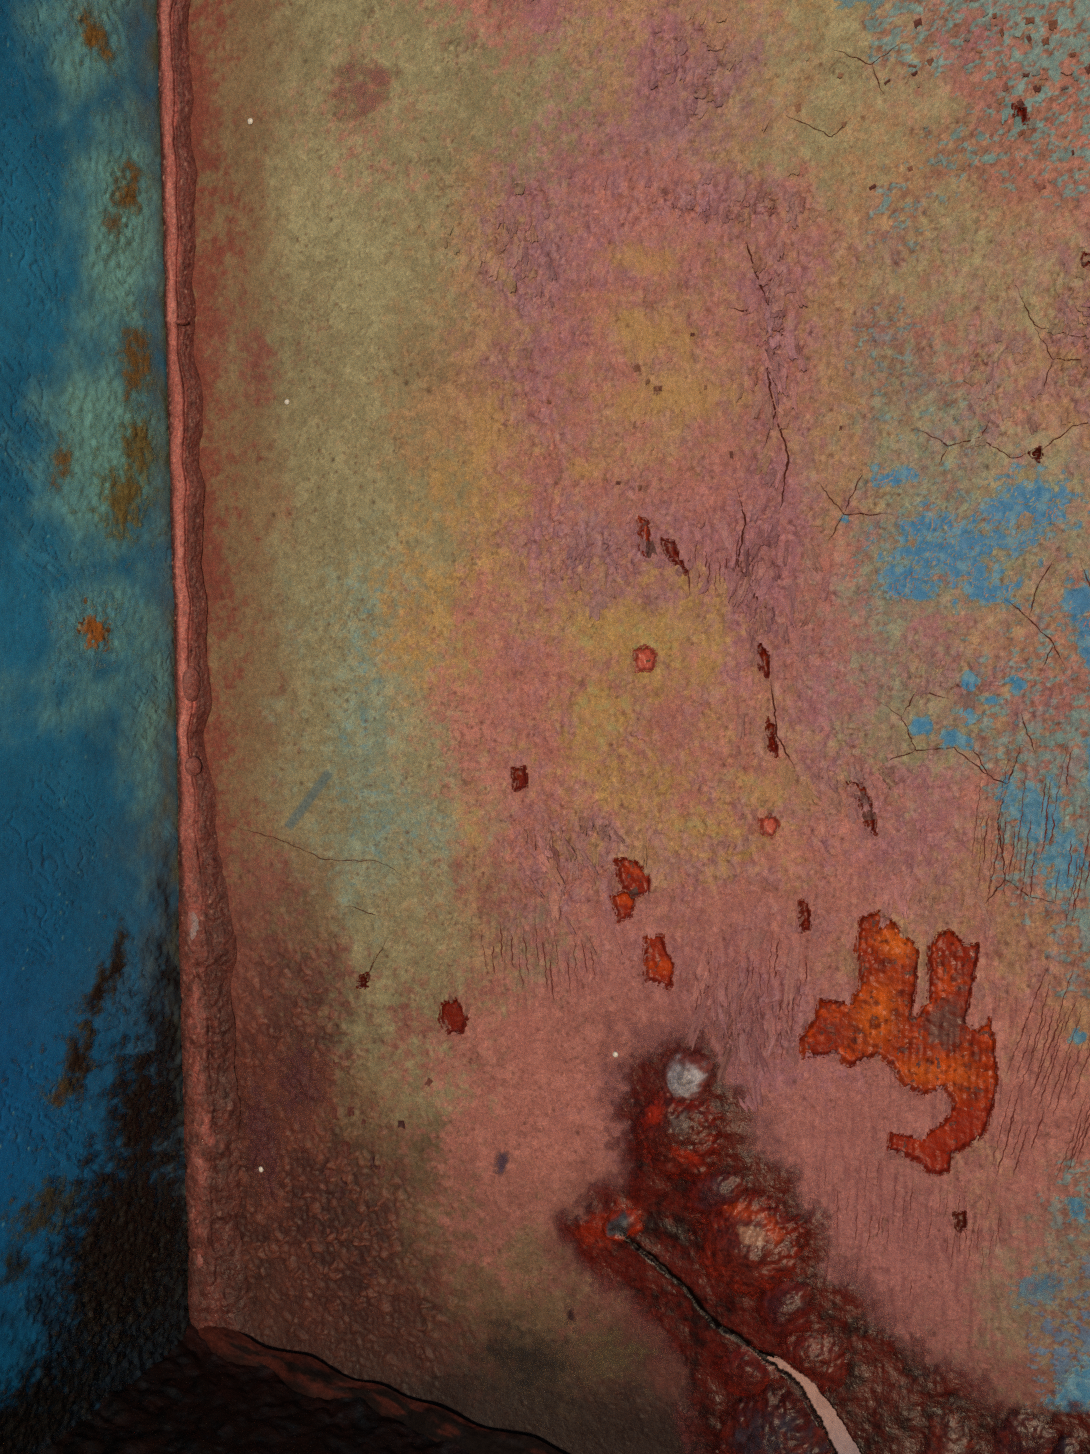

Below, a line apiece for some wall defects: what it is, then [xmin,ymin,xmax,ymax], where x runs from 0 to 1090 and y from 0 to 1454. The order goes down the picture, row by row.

corrosion [64,0,116,76]
corrosion [74,294,161,541]
corrosion [57,569,141,663]
peeling [516,445,1090,689]
peeling [510,765,529,792]
peeling [765,668,1028,841]
peeling [982,737,1090,917]
corrosion [42,919,133,1109]
peeling [433,995,477,1048]
peeling [520,812,1010,1177]
corrosion [555,1031,1090,1454]
crack [624,1232,861,1454]